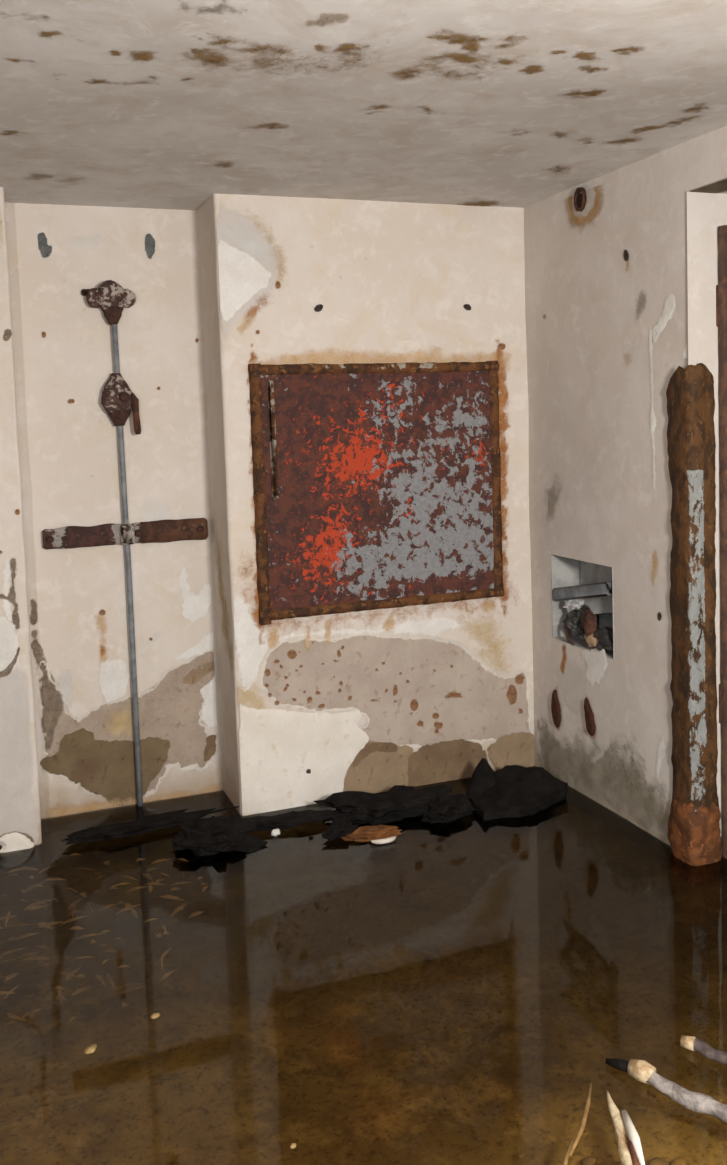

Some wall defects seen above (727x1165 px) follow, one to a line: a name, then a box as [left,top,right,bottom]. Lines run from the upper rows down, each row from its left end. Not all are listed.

damp [180,33,395,82]
damp [390,28,554,82]
damp [551,44,645,74]
corrosion [564,184,604,232]
damp [690,179,727,193]
peeling [216,202,289,339]
corrosion [216,281,521,708]
peeling [0,616,19,674]
flaking render [35,627,218,801]
flaking render [233,595,534,750]
corrosion [370,672,443,734]
corrosion [507,674,524,714]